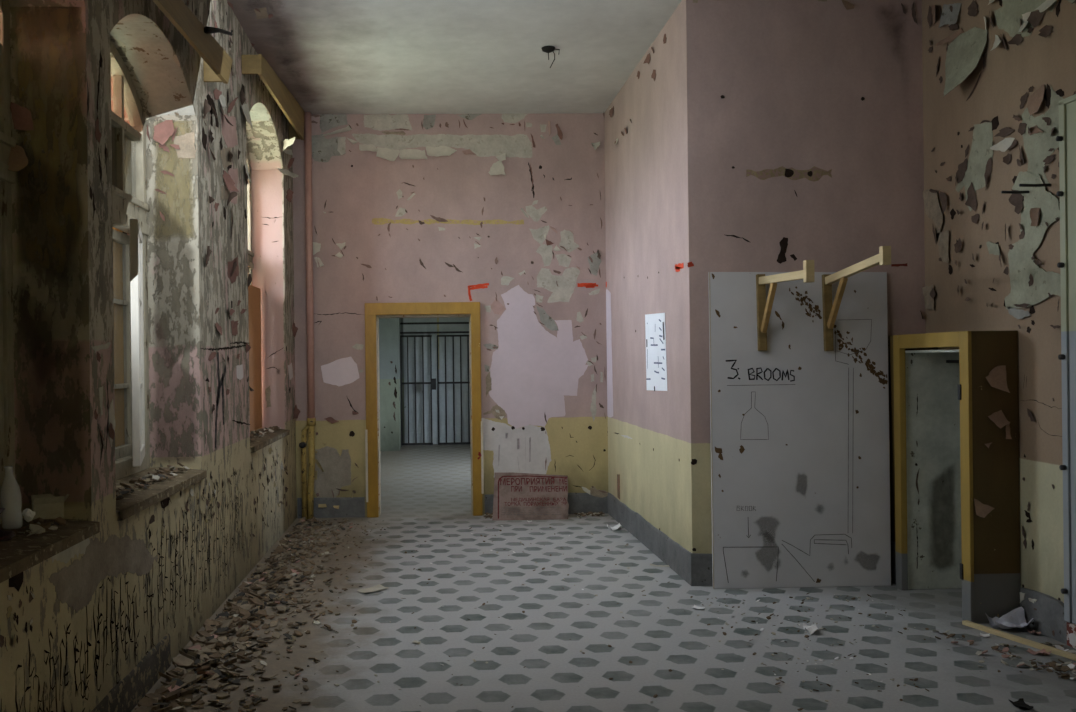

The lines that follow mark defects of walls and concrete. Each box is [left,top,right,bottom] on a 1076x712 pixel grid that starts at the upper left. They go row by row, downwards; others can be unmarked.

peeling [901,0,1076,101]
water stain [16,7,80,277]
water stain [155,121,192,237]
peeling [378,178,448,236]
peeling [311,113,563,175]
peeling [923,84,1076,333]
peeling [484,200,601,331]
flaking render [482,365,551,476]
peeling [985,365,1010,393]
peeling [988,410,1012,439]
peeling [149,443,288,544]
peeling [1021,502,1034,549]